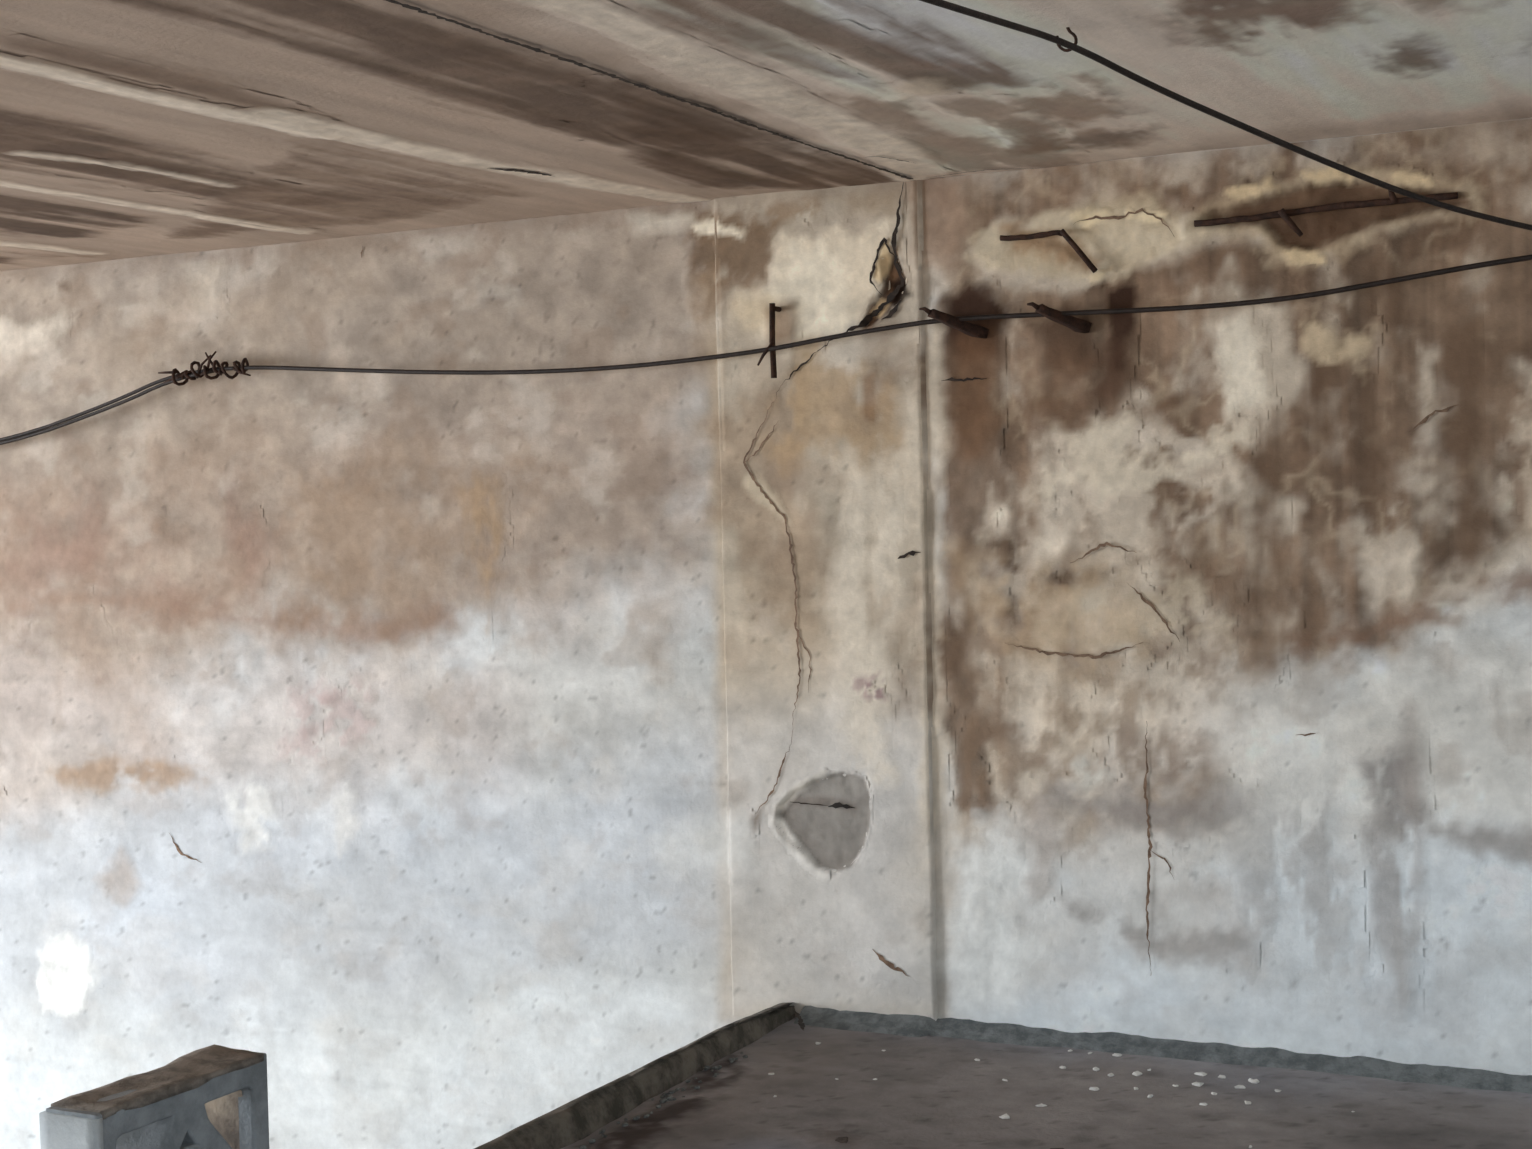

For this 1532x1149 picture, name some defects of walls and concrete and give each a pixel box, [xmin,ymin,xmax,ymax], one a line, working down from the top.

damp [1103,0,1532,82]
damp [0,0,1307,456]
crack [385,0,1058,812]
flaking render [722,211,914,348]
damp [1126,221,1532,450]
damp [1291,119,1532,225]
damp [0,415,590,865]
damp [611,585,695,691]
damp [751,260,1532,1031]
damp [90,839,148,915]
crack [1143,721,1171,970]